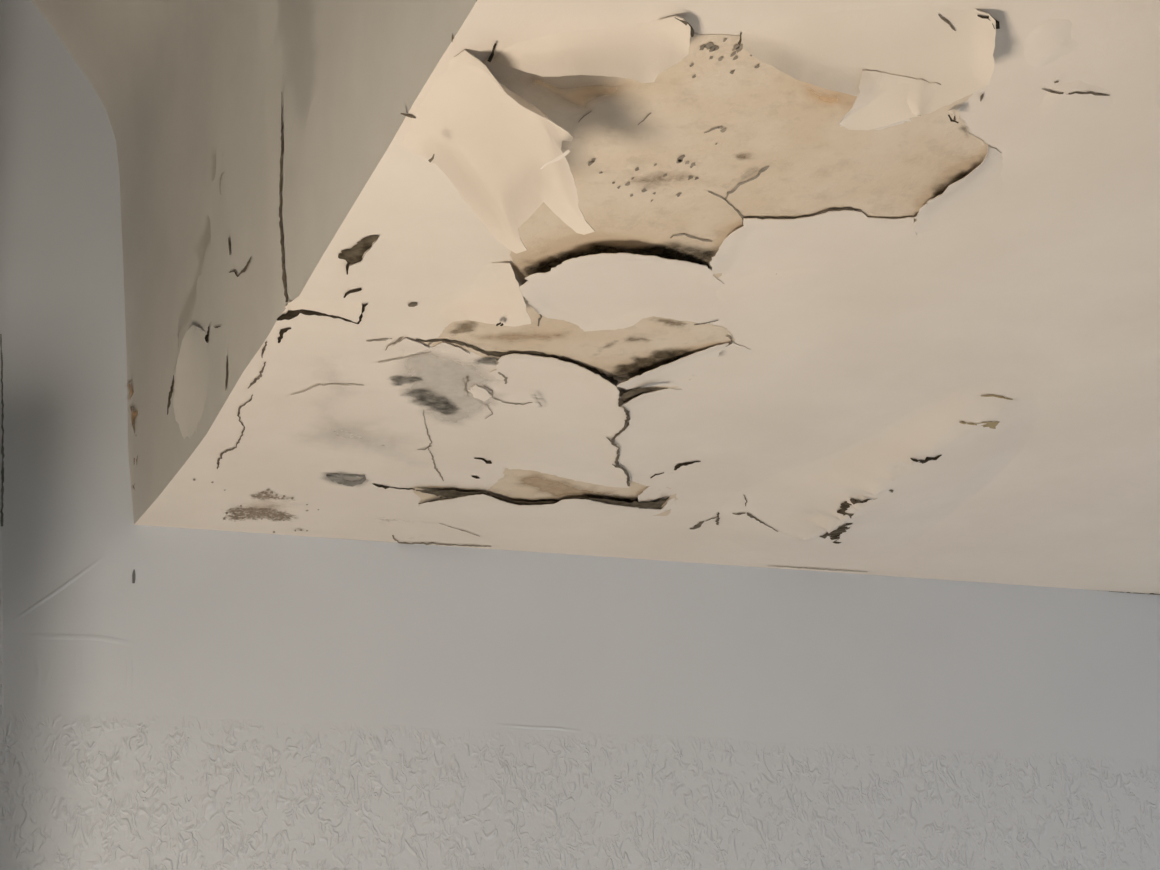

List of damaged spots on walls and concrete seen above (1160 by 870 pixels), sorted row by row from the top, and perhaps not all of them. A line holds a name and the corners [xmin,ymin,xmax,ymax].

peeling [373,6,1004,407]
crack [217,92,433,469]
mould [378,338,508,384]
mould [392,376,455,414]
mould [462,376,542,419]
peeling [413,468,680,528]